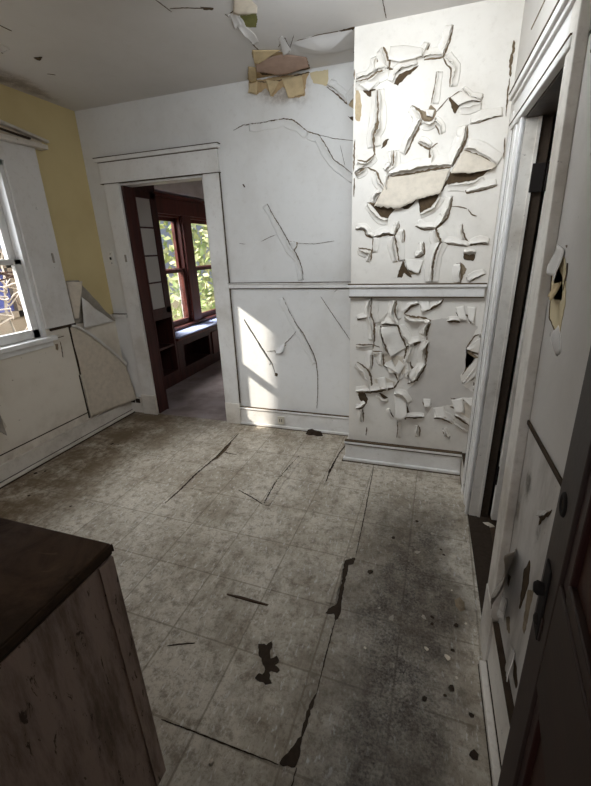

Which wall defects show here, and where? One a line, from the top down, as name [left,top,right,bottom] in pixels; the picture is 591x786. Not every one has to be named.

peeling [229,0,258,30]
crack [235,118,355,196]
peeling [248,24,503,283]
crack [263,204,332,281]
peeling [546,244,568,356]
crack [279,297,318,401]
peeling [354,298,483,438]
peeling [490,549,516,634]
peeling [519,560,539,633]
peeling [505,645,518,688]